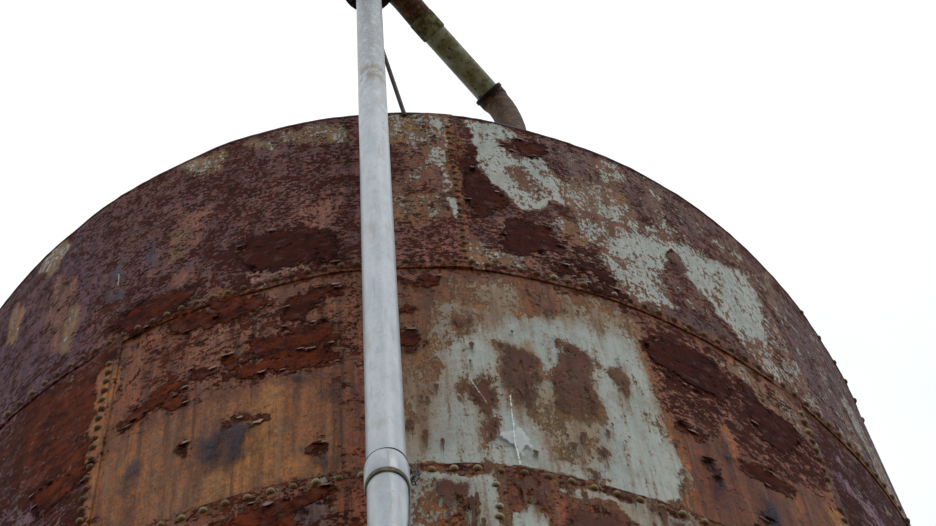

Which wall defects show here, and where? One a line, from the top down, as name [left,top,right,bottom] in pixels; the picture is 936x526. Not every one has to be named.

peeling [457,137,634,303]
peeling [397,274,443,291]
peeling [398,300,430,353]